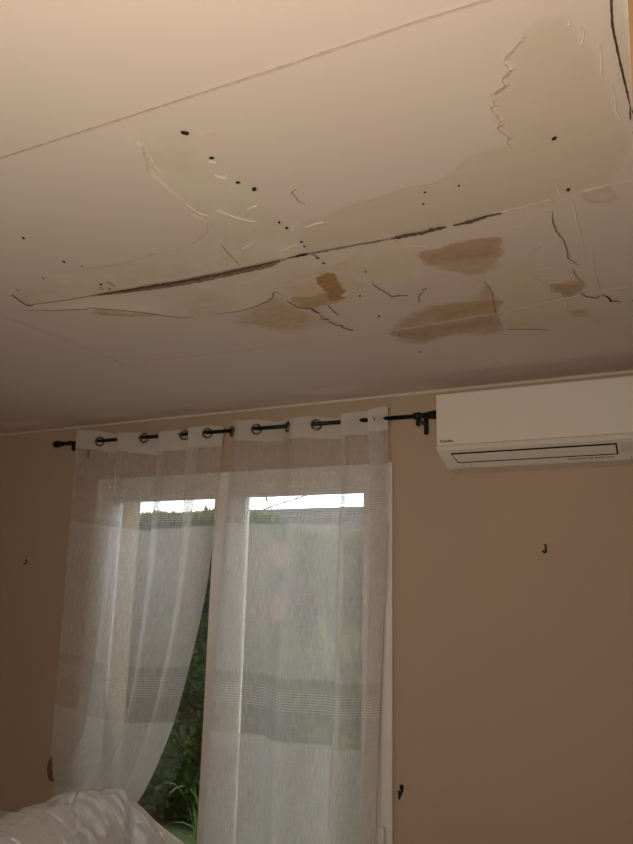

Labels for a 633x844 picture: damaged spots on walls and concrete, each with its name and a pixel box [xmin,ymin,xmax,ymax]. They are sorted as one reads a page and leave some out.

crack [0,0,489,159]
crack [610,0,633,120]
leakage [178,248,377,335]
crack [287,301,353,331]
crack [12,199,633,306]
leakage [386,235,551,346]